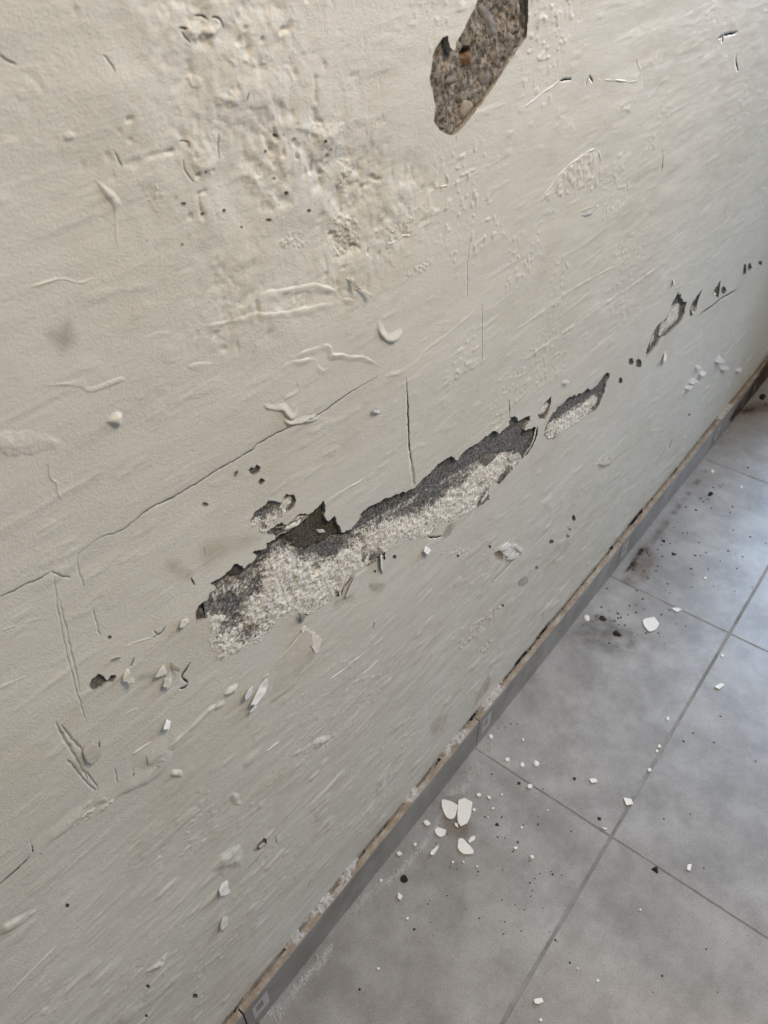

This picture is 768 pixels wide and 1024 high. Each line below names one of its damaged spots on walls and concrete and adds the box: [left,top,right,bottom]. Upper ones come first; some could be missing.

spalling [430,0,529,135]
spalling [628,279,727,368]
crack [0,376,379,598]
spalling [179,372,623,662]
crack [405,377,416,486]